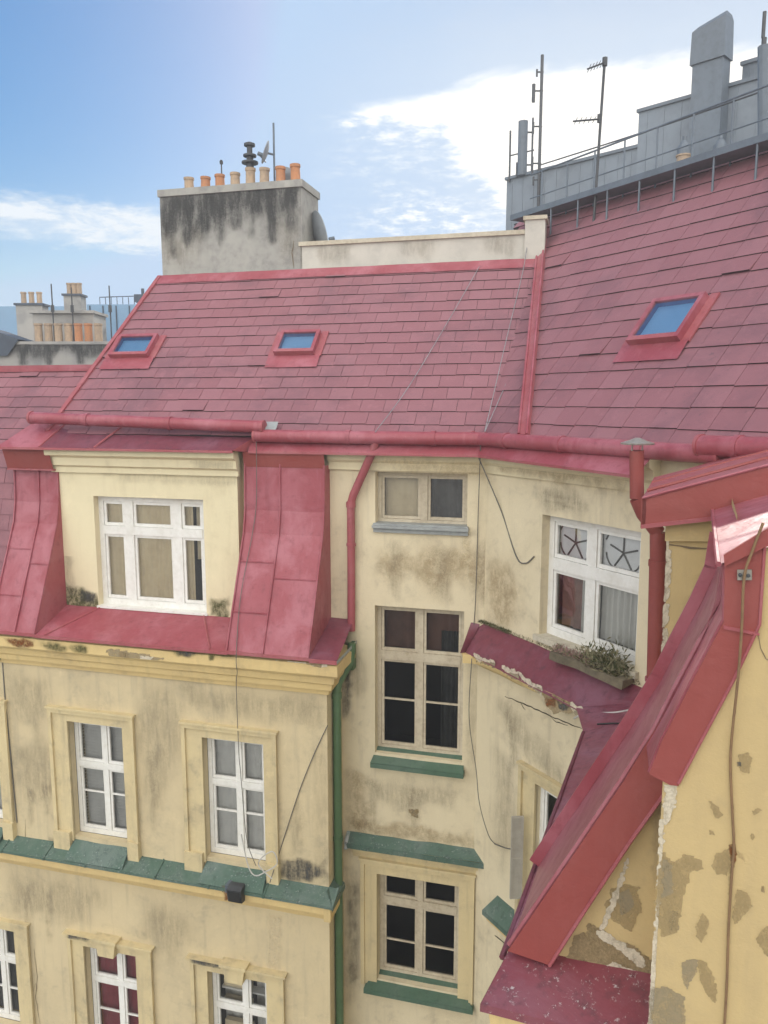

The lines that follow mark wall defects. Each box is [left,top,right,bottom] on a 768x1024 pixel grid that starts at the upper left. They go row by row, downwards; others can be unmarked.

leakage [167,193,223,242]
leakage [252,187,296,242]
spalling [473,653,583,716]
crack [505,696,582,729]
peeling [738,752,752,773]
peeling [709,801,723,818]
leakage [281,860,320,881]
flaking render [566,849,731,974]
peeling [648,959,717,1024]